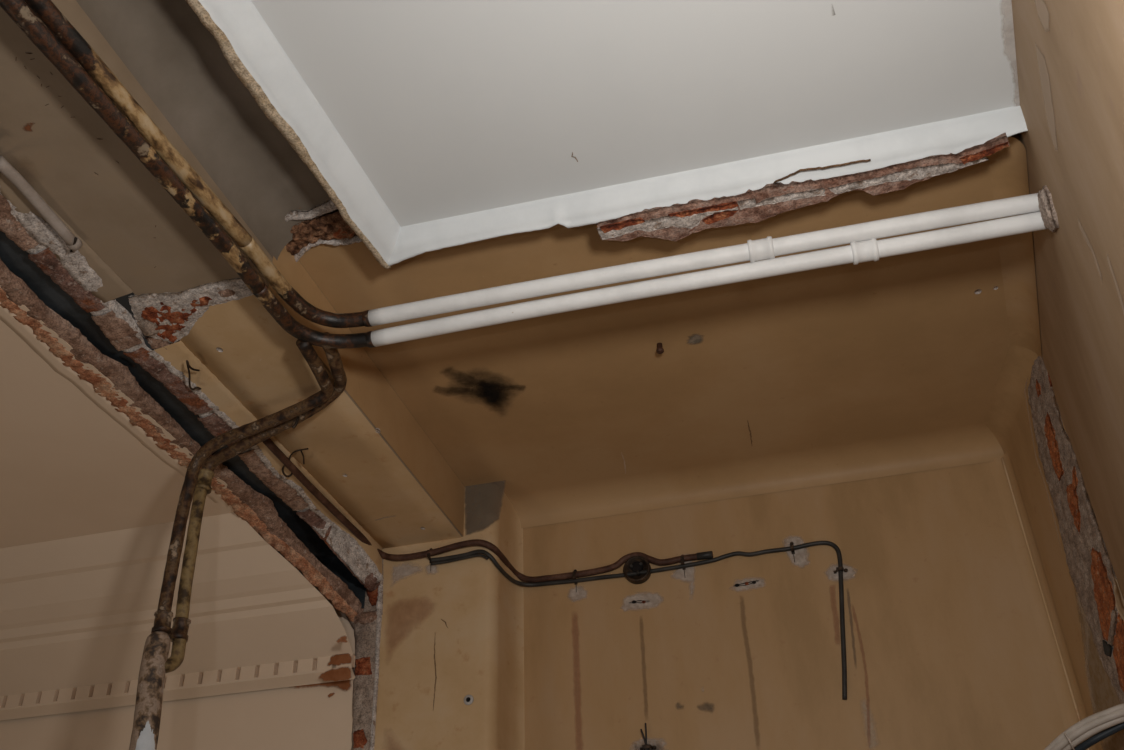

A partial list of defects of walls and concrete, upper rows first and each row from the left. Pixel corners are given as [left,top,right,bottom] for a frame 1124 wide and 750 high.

flaking render [185,0,390,268]
spalling [596,133,1010,241]
spalling [0,288,212,468]
flaking render [1044,412,1081,534]
spalling [211,477,358,622]
flaking render [1091,548,1124,692]